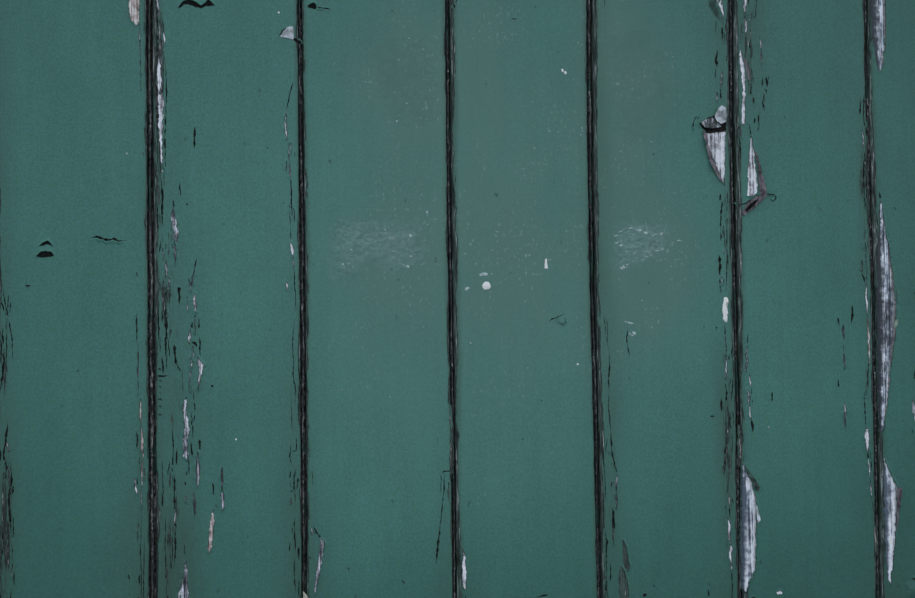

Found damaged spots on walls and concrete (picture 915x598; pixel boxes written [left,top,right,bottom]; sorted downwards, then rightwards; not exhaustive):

peeling [691,0,777,215]
peeling [869,0,888,73]
peeling [125,0,228,598]
peeling [303,525,328,598]
peeling [721,324,761,595]
peeling [836,192,902,585]